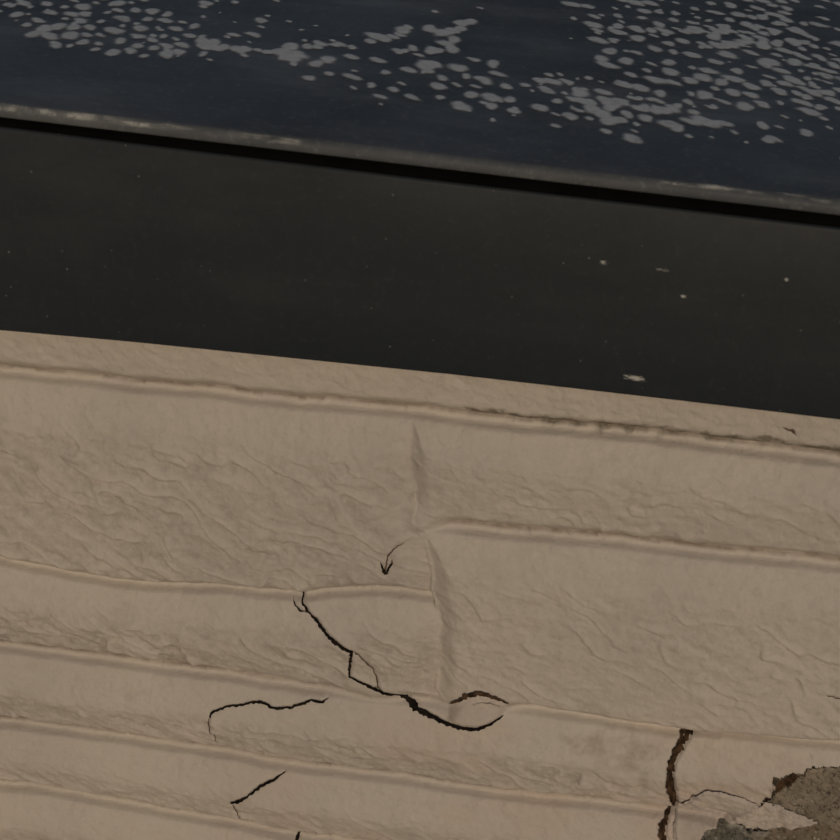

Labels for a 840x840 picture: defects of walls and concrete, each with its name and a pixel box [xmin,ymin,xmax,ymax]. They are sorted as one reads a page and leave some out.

crack [380,543,404,575]
crack [293,592,504,732]
crack [207,697,329,742]
crack [230,771,286,820]
crack [658,729,693,840]